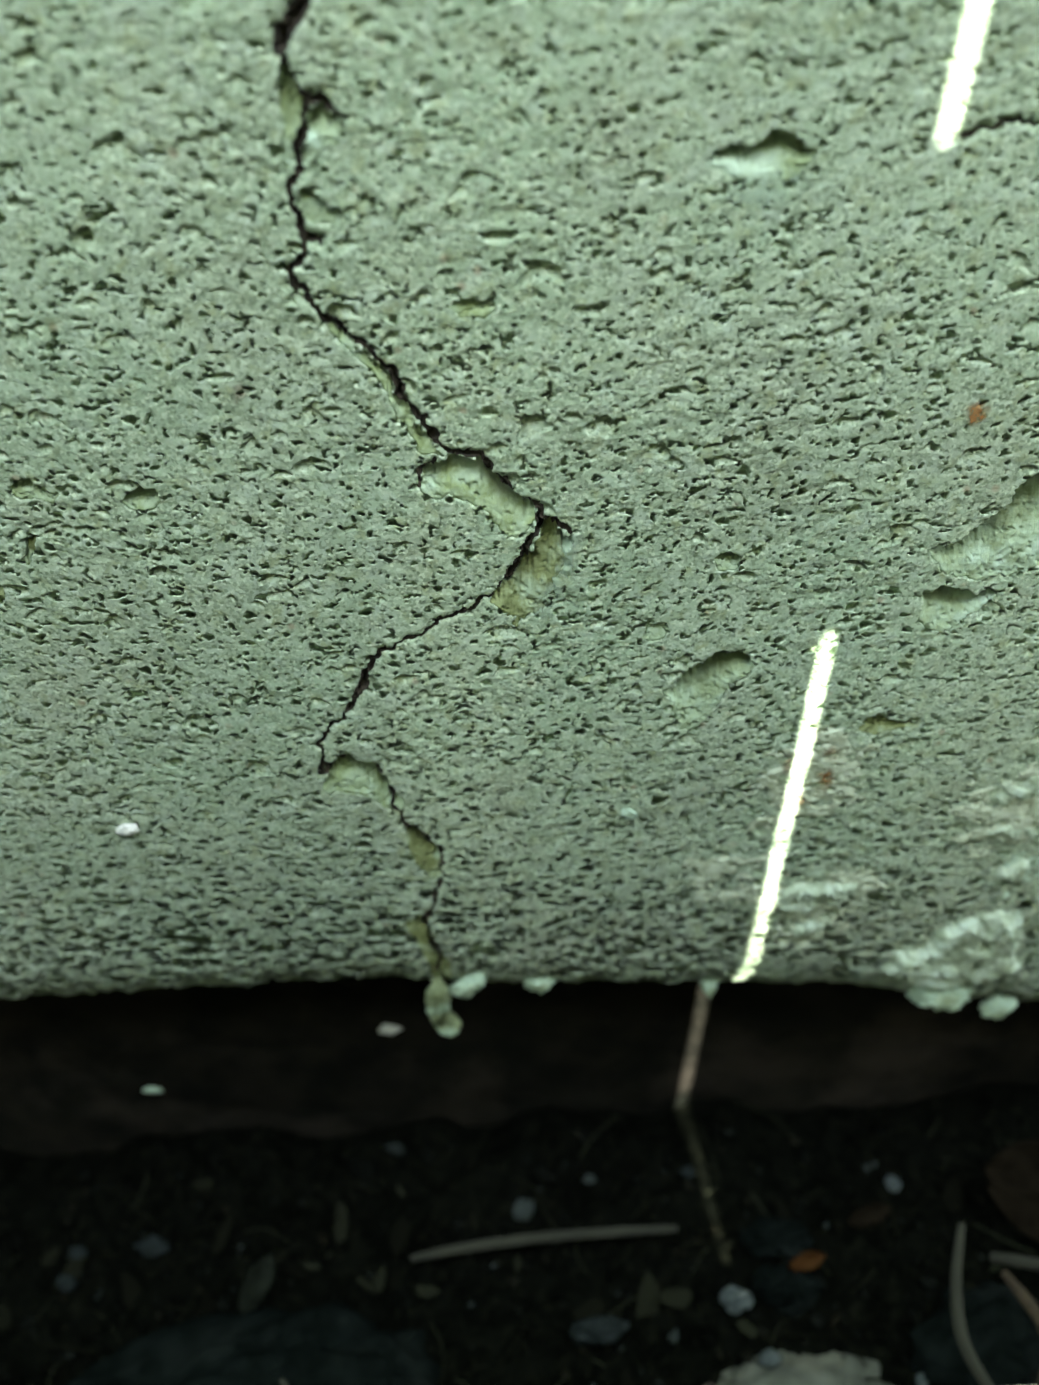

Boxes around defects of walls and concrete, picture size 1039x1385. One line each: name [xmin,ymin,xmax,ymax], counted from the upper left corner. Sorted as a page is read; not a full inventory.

crack [272,0,573,975]
spalling [325,321,573,627]
spalling [918,473,1039,632]